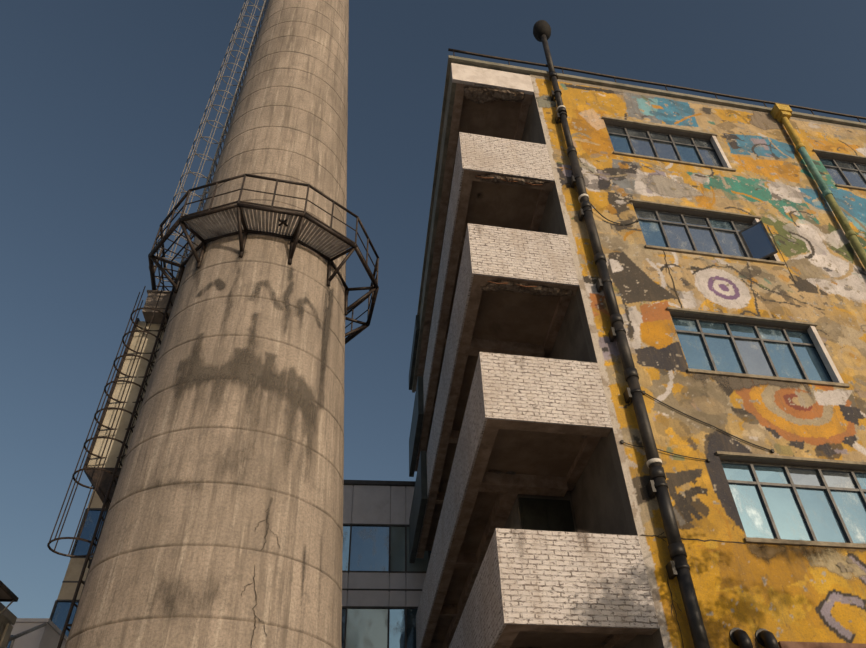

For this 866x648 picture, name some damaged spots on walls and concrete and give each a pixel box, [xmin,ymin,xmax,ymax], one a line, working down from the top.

spalling [464,87,525,104]
spalling [475,173,550,186]
spalling [480,280,573,297]
leakage [176,268,333,458]
crack [241,508,280,645]